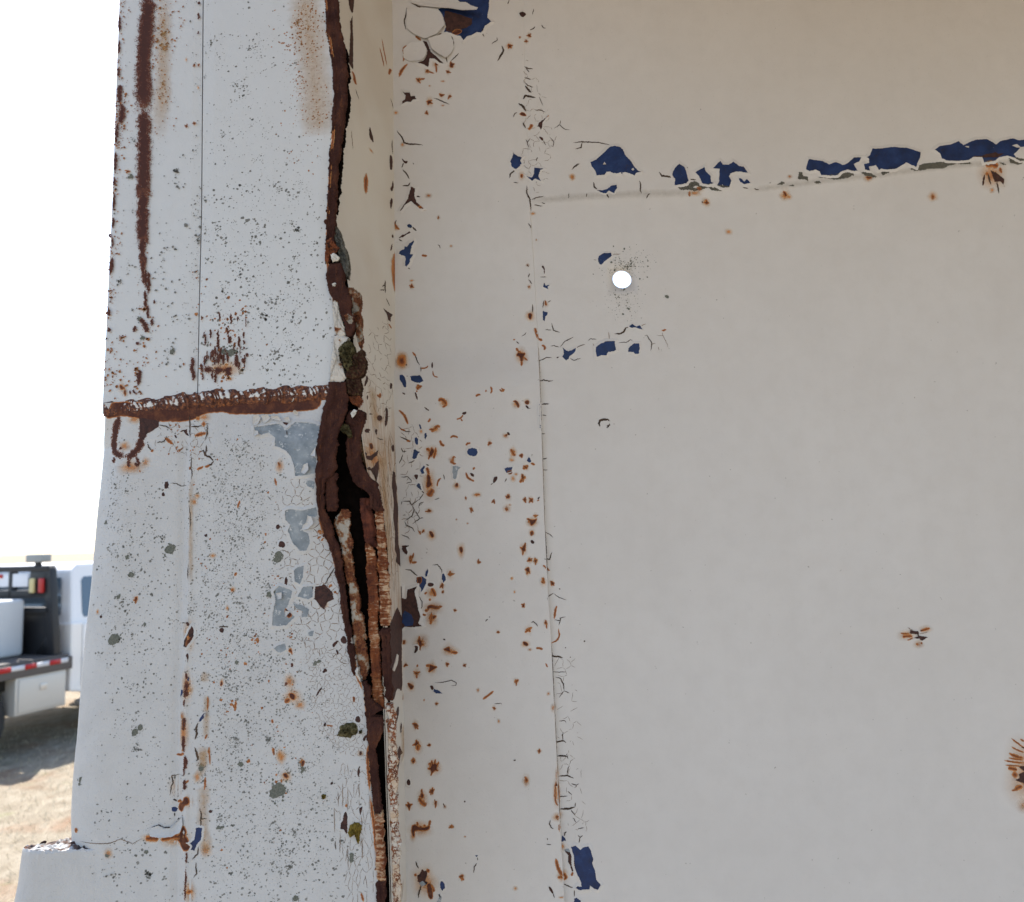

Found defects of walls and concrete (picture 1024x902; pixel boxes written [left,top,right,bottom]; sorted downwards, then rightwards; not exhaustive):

peeling [403,0,496,71]
crack [492,39,591,228]
peeling [577,141,643,198]
peeling [659,158,753,192]
peeling [770,136,1024,186]
corrosion [103,0,321,472]
crack [278,0,445,902]
corrosion [520,497,555,586]
crack [517,325,589,845]
corrosion [146,673,206,899]
corrosion [1005,739,1024,791]
peeling [561,832,605,902]